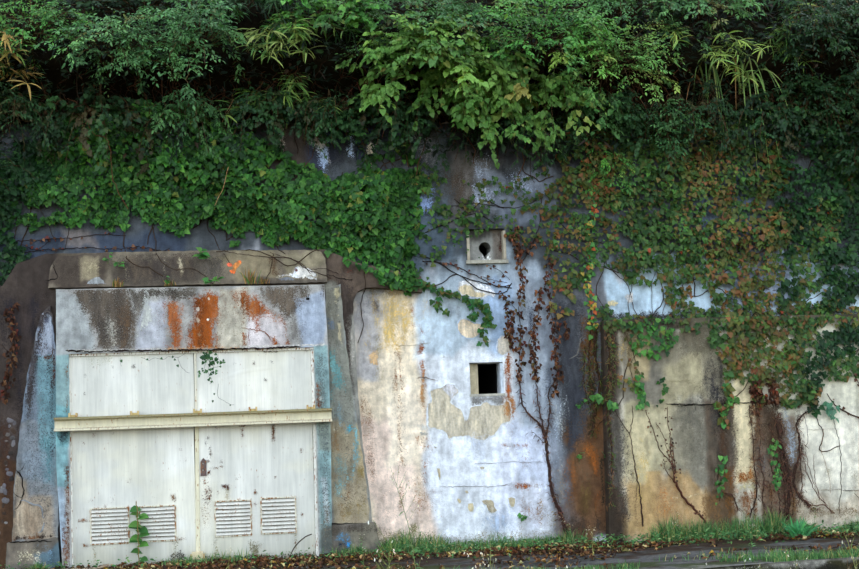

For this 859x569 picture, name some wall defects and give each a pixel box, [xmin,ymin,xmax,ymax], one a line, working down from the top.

peeling [36,311,54,369]
corrosion [161,289,291,362]
peeling [458,281,495,299]
peeling [457,319,513,355]
damp [0,251,434,566]
peeling [420,382,513,442]
damp [436,294,800,544]
peeling [0,418,45,536]
corrosion [511,408,603,529]